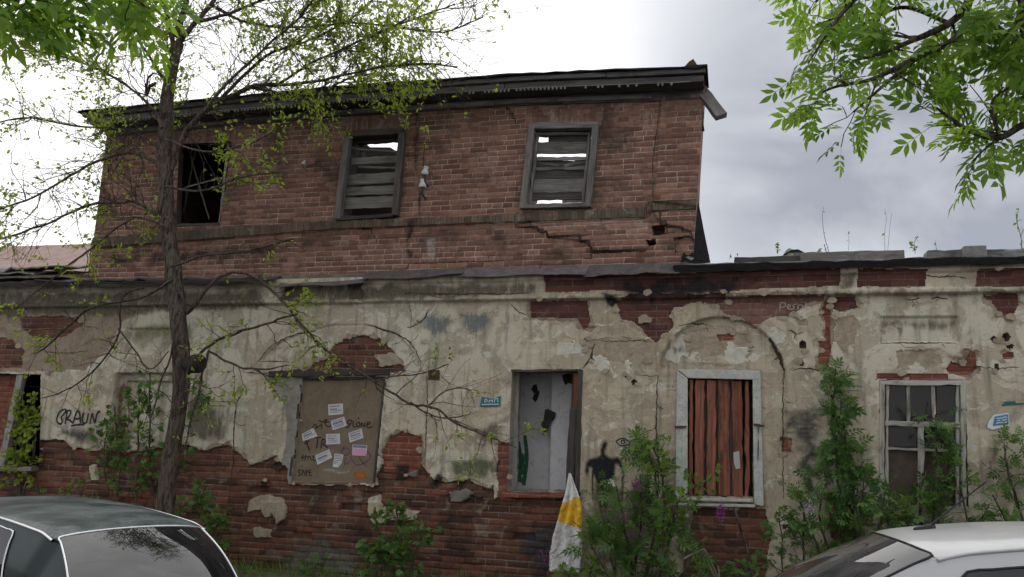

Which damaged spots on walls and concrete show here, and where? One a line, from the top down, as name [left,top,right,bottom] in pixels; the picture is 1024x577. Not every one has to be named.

crack [518,108,694,259]
flaking render [0,299,135,375]
flaking render [303,331,406,375]
flaking render [526,268,928,386]
flaking render [876,266,1024,382]
crack [768,330,818,498]
flaking render [0,437,163,510]
flaking render [176,429,588,577]